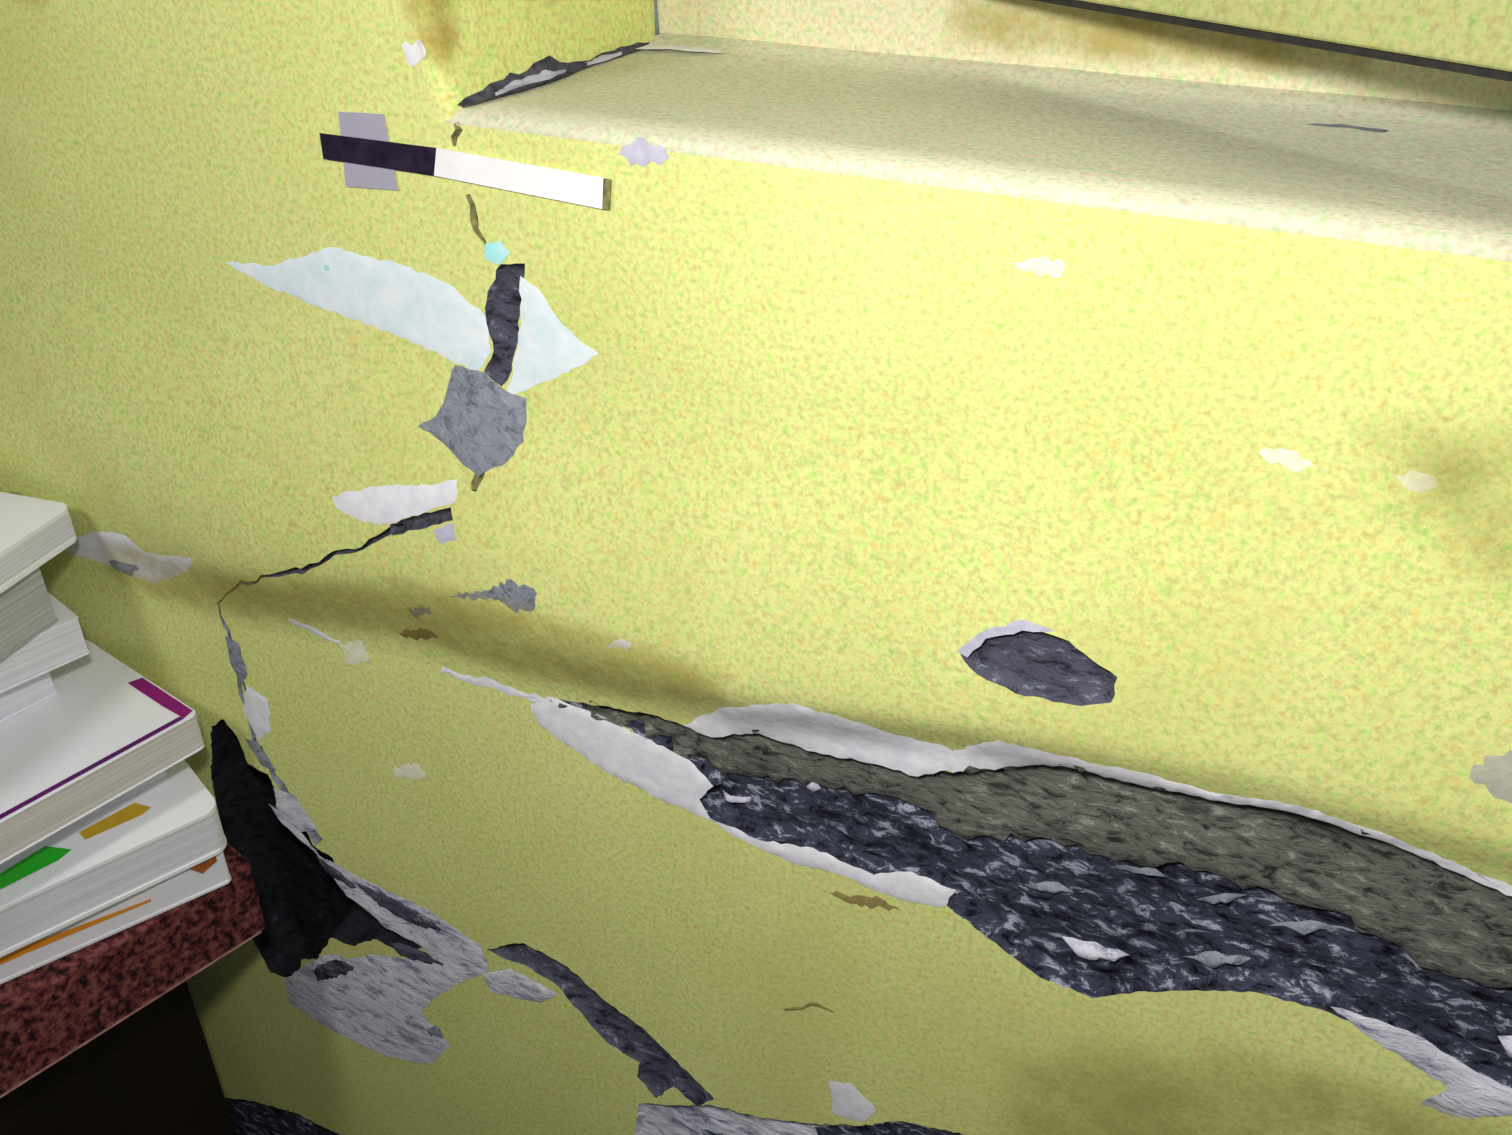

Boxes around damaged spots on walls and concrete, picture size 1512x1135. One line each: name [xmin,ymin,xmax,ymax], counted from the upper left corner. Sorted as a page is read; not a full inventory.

crack [466,194,487,245]
peeling [225,241,599,524]
peeling [66,531,193,584]
crack [218,473,485,846]
peeling [450,579,537,613]
flaking render [957,619,1117,706]
peeling [210,719,963,1135]
flaking render [527,697,1512,1119]